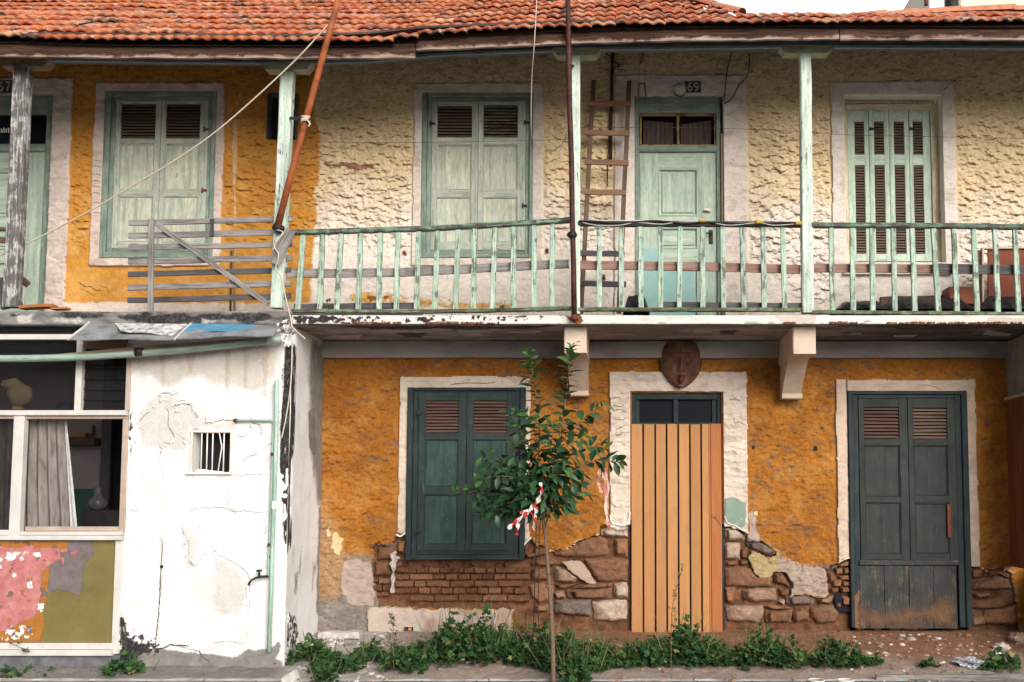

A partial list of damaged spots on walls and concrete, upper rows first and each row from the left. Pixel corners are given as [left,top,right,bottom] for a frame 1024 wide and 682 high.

peeling [139,390,235,452]
water stain [280,345,296,553]
peeling [0,540,94,643]
crack [154,543,244,661]
spalling [326,513,631,621]
spalling [724,497,850,624]